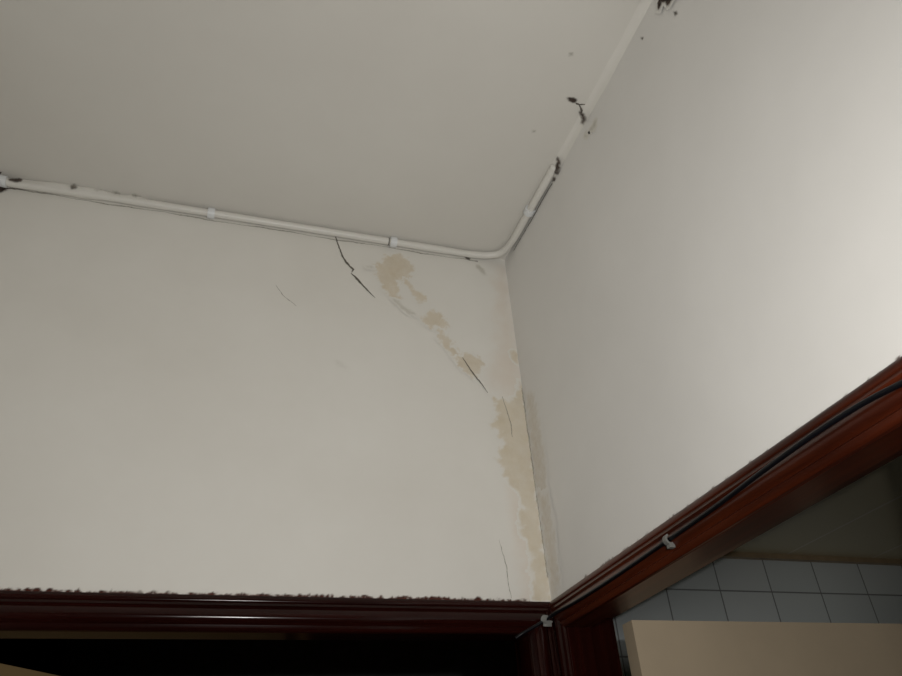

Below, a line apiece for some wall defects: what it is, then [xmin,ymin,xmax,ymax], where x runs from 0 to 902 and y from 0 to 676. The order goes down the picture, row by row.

spalling [655,0,677,15]
spalling [568,97,598,140]
crack [335,237,373,296]
leakage [474,258,563,602]